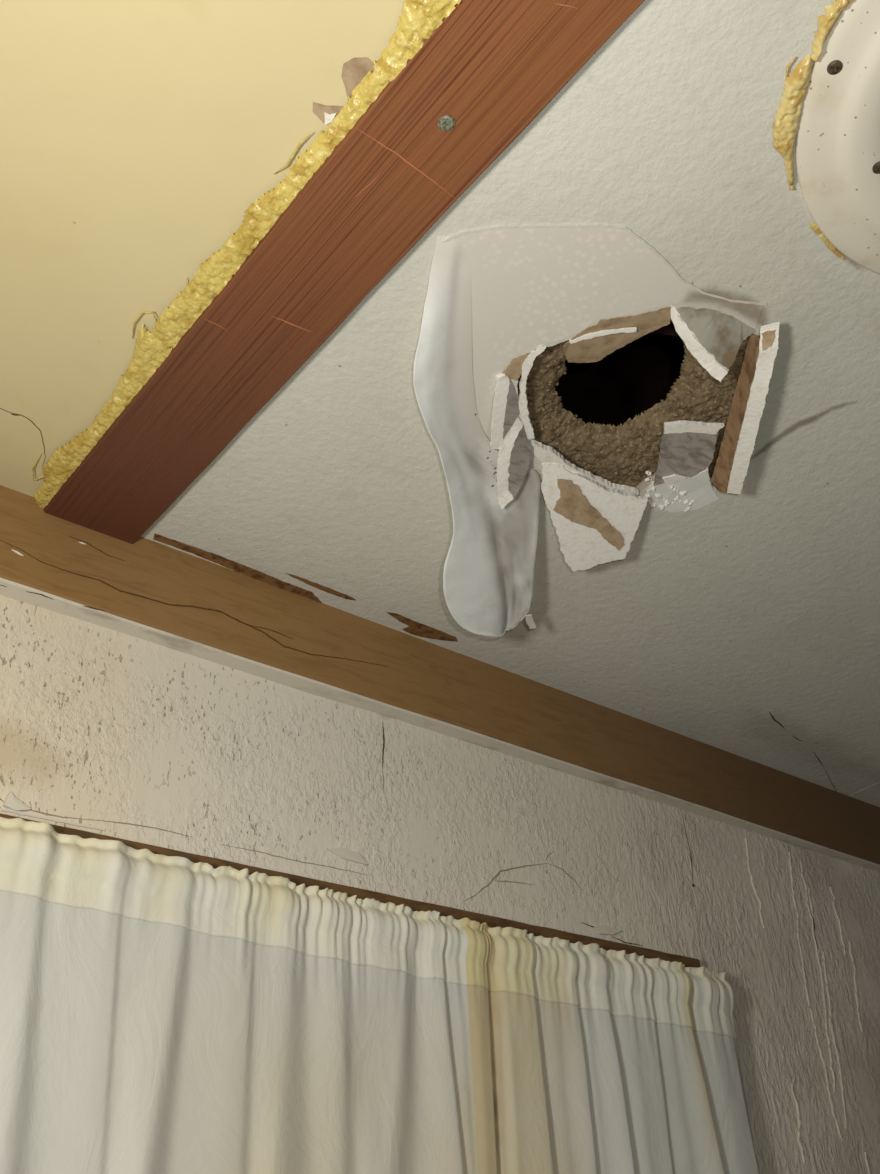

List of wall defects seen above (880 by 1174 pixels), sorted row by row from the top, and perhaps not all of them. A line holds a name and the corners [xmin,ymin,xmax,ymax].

peeling [387,223,767,642]
crack [1,536,389,667]
peeling [153,533,356,603]
crack [464,852,581,901]